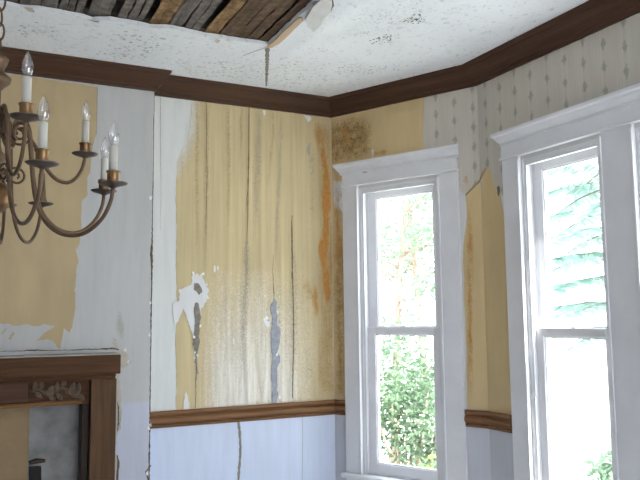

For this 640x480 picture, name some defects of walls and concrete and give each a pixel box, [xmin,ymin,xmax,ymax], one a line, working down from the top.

flaking render [6,0,332,49]
leakage [198,106,389,408]
peeling [173,272,209,359]
spalling [263,292,281,403]
crack [235,422,243,480]